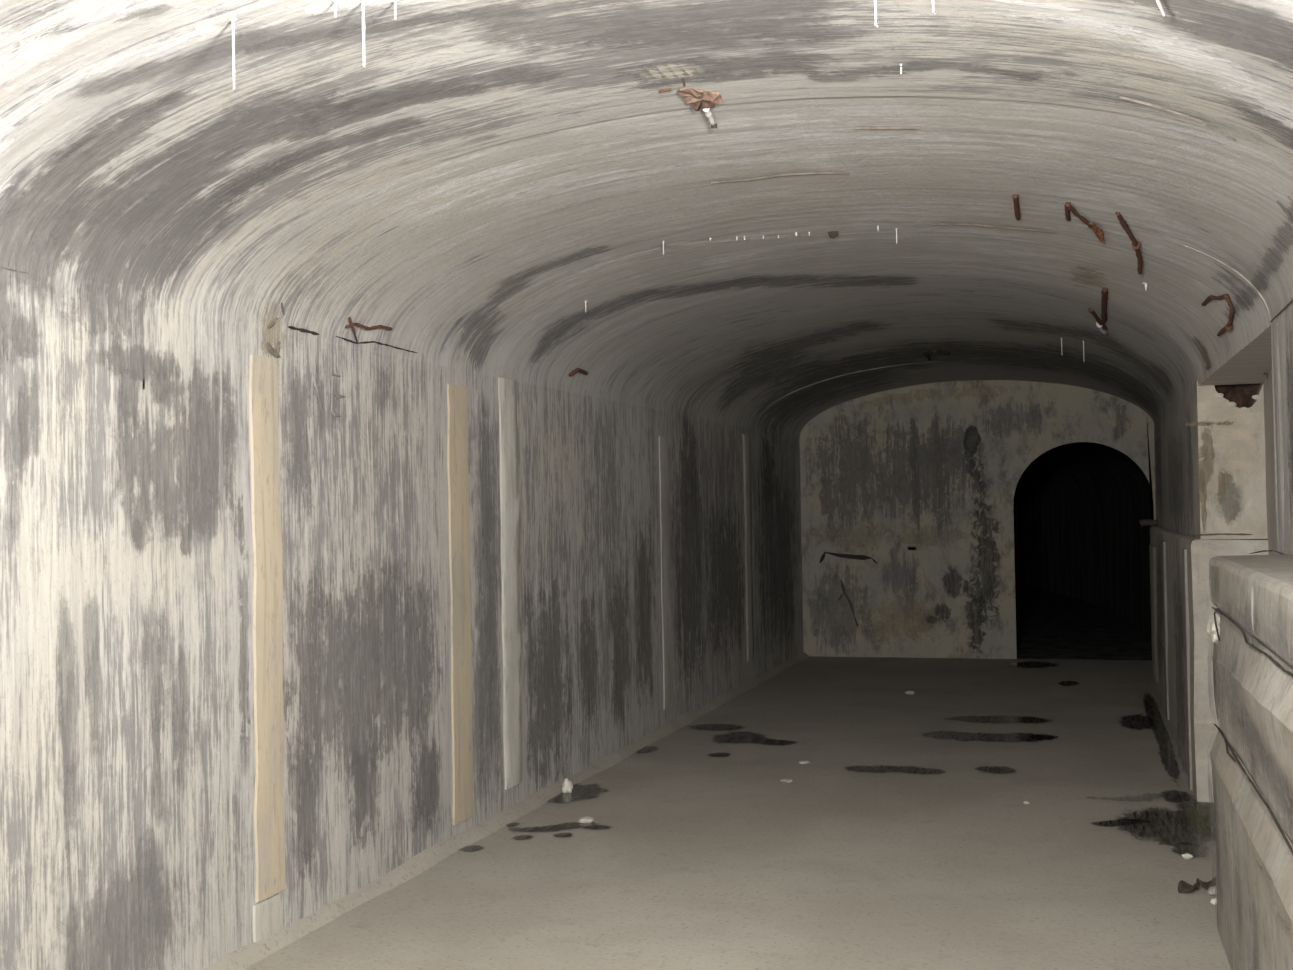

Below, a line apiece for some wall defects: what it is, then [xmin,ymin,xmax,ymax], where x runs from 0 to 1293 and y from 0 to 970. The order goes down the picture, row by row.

water stain [0,0,1045,149]
water stain [996,0,1293,147]
water stain [0,65,558,554]
crack [265,303,417,358]
water stain [462,233,806,366]
water stain [534,275,916,358]
water stain [673,320,1170,678]
water stain [1272,334,1293,538]
water stain [524,526,654,788]
water stain [1155,537,1186,769]
crack [1211,607,1293,677]
crack [1214,724,1293,854]